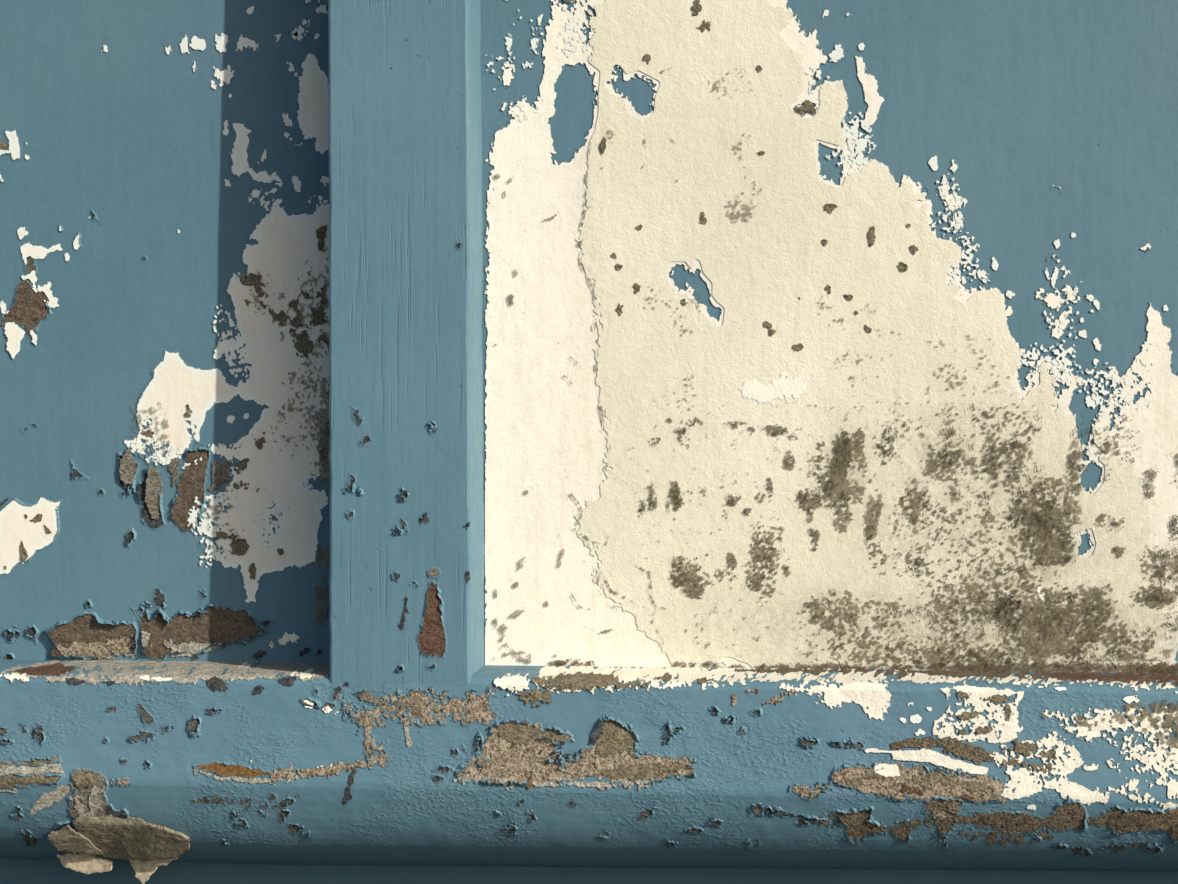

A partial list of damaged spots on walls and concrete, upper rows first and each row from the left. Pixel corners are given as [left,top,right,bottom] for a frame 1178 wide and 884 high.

spalling [165,33,259,98]
peeling [275,0,329,156]
damp [725,134,762,223]
peeling [0,120,330,692]
damp [649,376,709,457]
peeling [485,0,1178,852]
damp [635,481,706,529]
damp [670,335,1178,673]
rust [416,565,448,660]
damp [549,654,595,666]
spalling [191,682,698,790]
spalling [0,722,190,884]